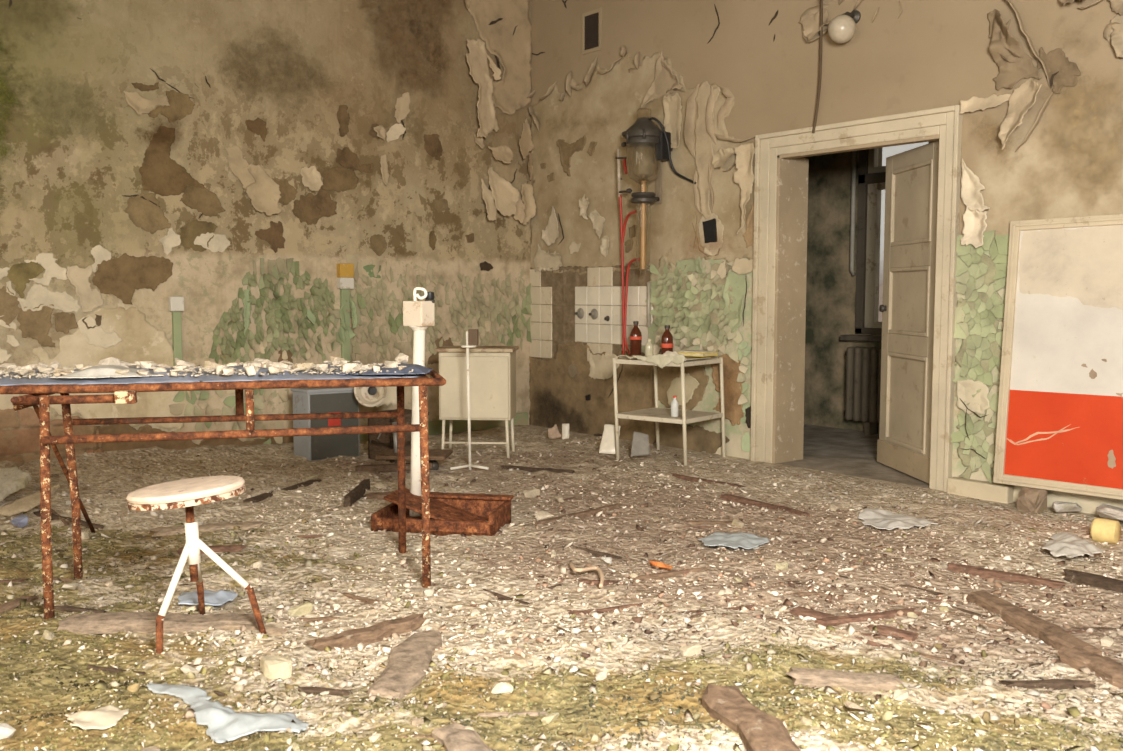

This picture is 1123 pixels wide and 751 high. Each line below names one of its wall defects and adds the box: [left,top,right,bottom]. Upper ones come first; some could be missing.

peeling [959,0,1081,152]
peeling [1104,14,1123,58]
peeling [0,82,231,368]
flaking render [0,389,294,463]
peeling [209,0,755,454]
peeling [951,157,1010,483]